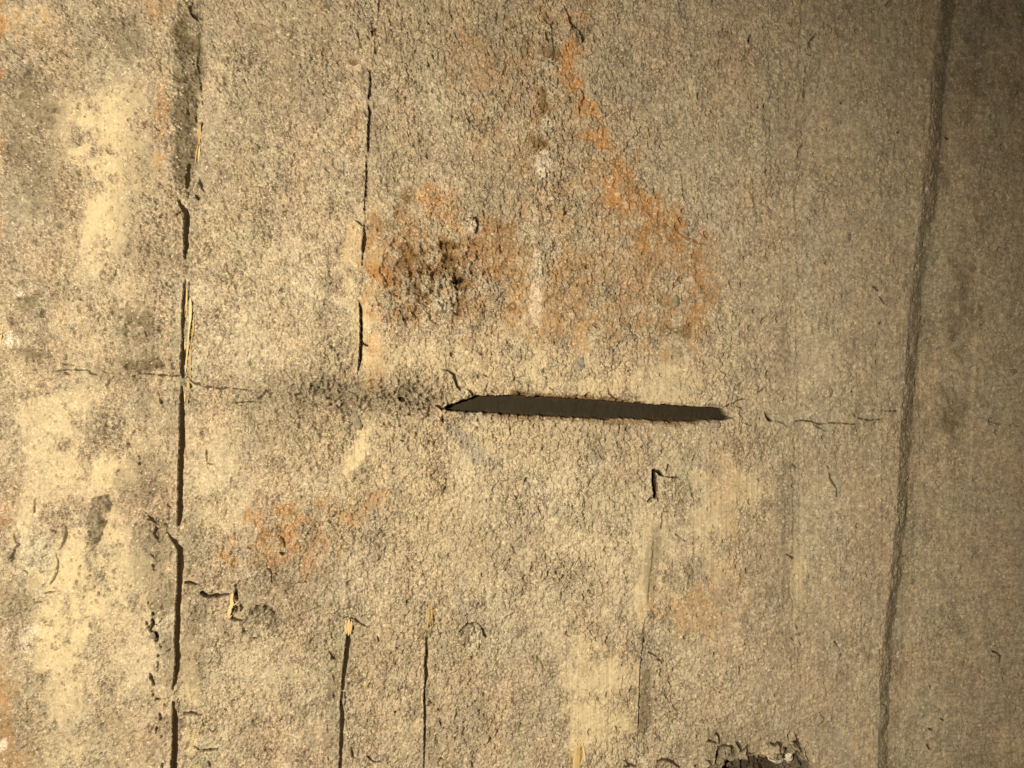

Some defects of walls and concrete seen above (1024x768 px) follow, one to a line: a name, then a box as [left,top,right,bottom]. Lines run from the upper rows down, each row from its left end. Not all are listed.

crack [185,0,204,137]
crack [354,0,381,266]
corrosion [341,0,728,381]
crack [357,300,369,375]
crack [56,163,314,768]
corrosion [211,487,393,581]
crack [326,615,369,768]
crack [418,629,443,768]
spalling [695,732,817,768]